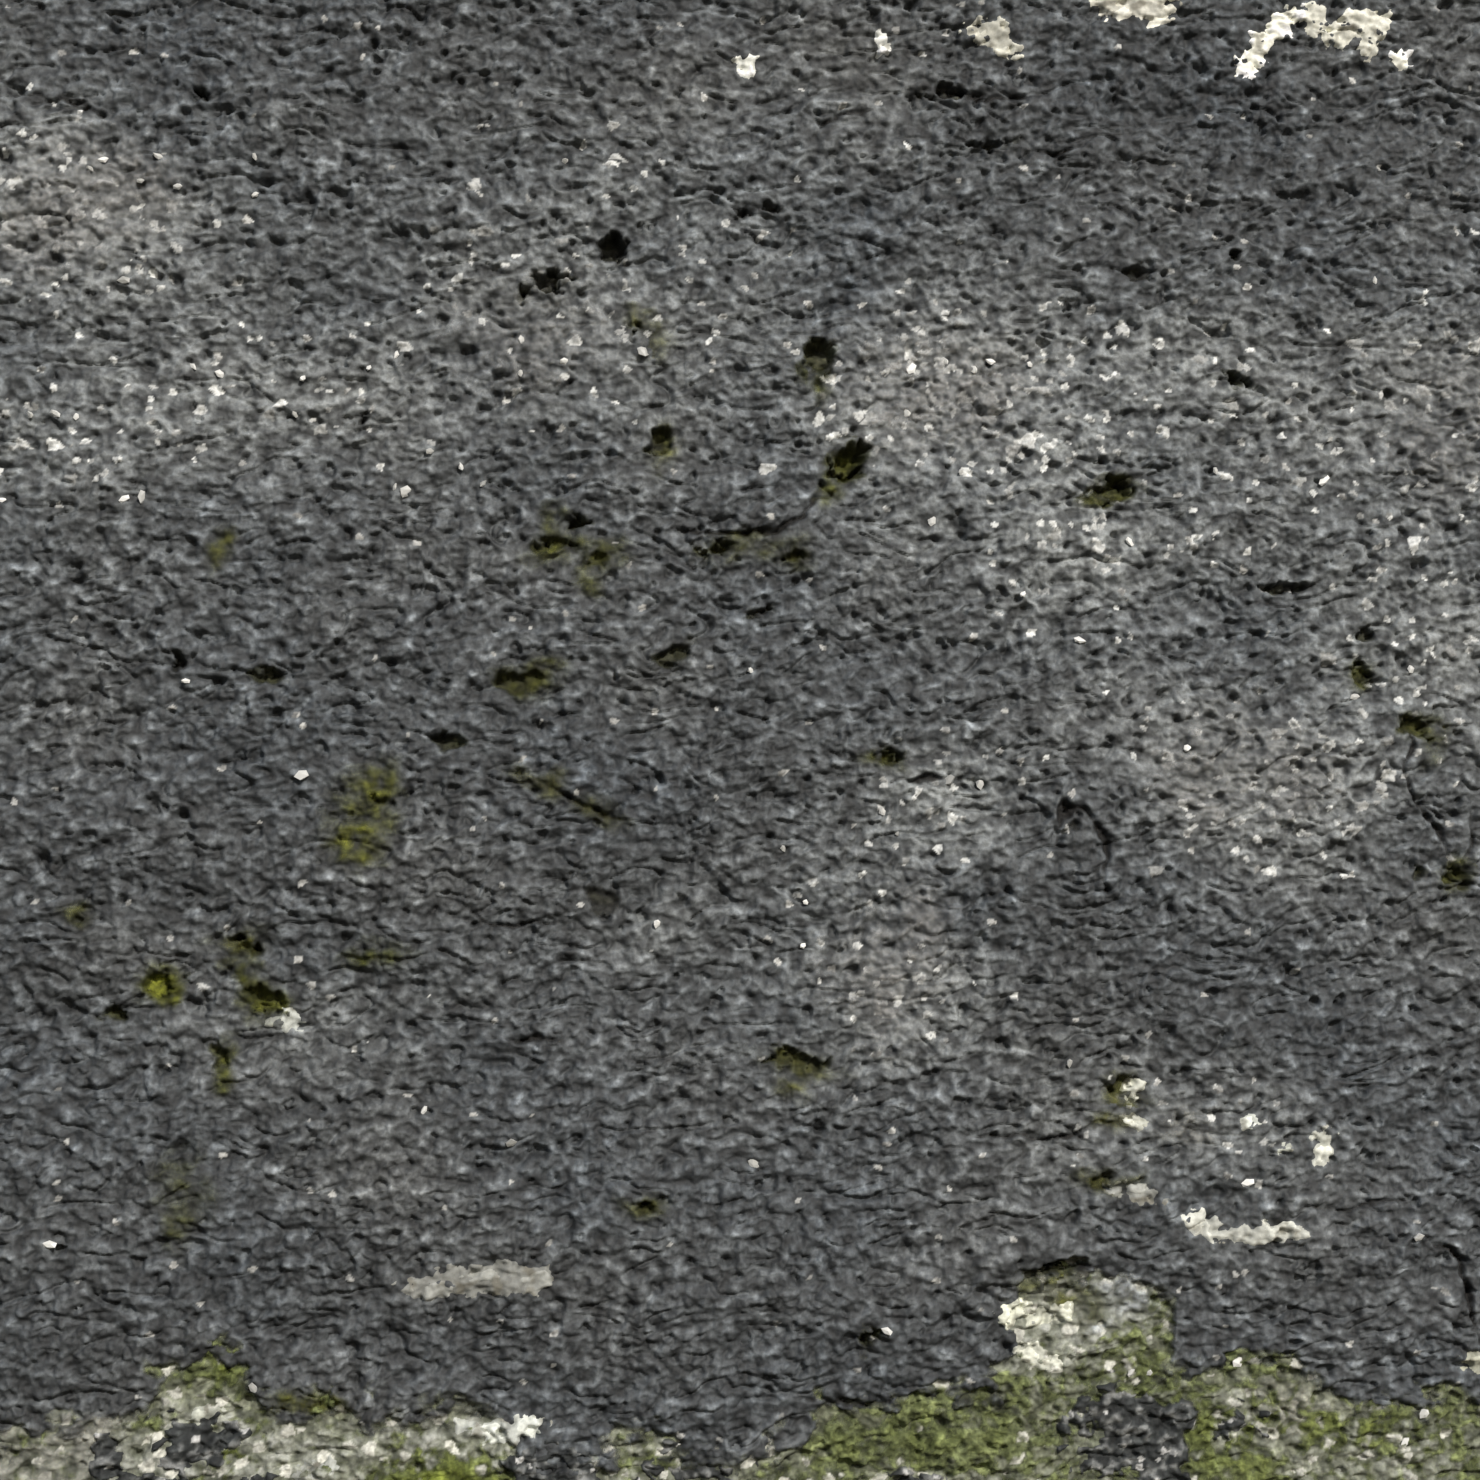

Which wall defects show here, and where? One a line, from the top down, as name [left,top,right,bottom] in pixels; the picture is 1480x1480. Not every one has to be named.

water stain [78,1420,106,1442]
spalling [0,1257,1480,1480]